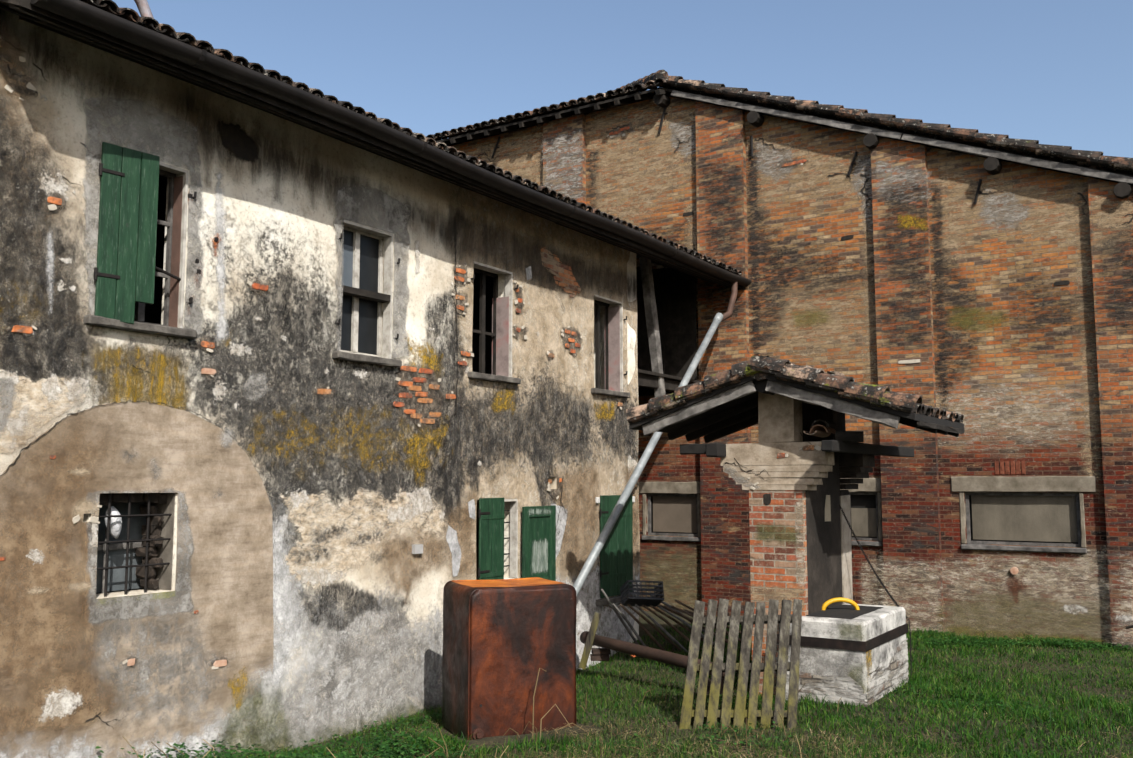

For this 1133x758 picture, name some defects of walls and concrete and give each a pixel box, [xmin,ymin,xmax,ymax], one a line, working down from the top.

damp [0,9,668,379]
flaking render [513,281,539,340]
damp [697,146,875,356]
damp [877,184,977,410]
flaking render [0,370,91,455]
flaking render [393,364,458,430]
damp [0,424,216,758]
damp [136,456,480,758]
flaking render [280,485,448,593]
damp [861,549,1133,644]
rust [1005,576,1027,603]
flaking render [39,685,83,723]